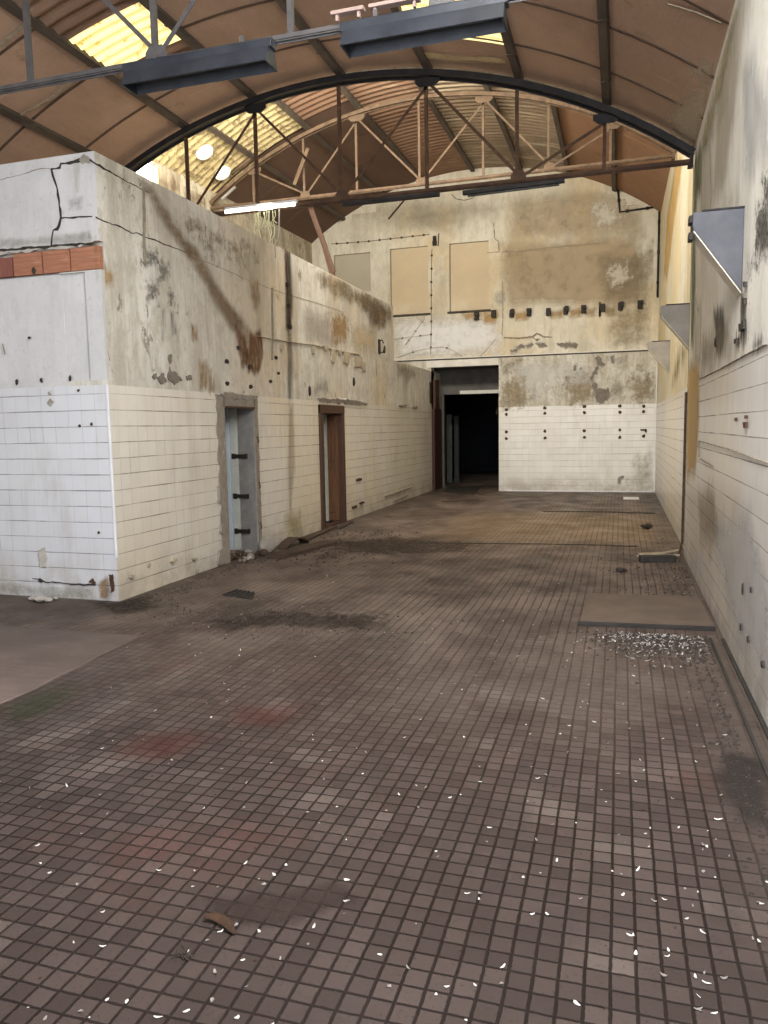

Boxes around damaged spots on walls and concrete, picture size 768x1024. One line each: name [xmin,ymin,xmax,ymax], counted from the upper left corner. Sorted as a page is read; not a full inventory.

damp [747,171,768,274]
crack [0,158,361,360]
peeling [152,354,192,385]
corrosion [235,326,263,373]
flaking render [565,354,616,405]